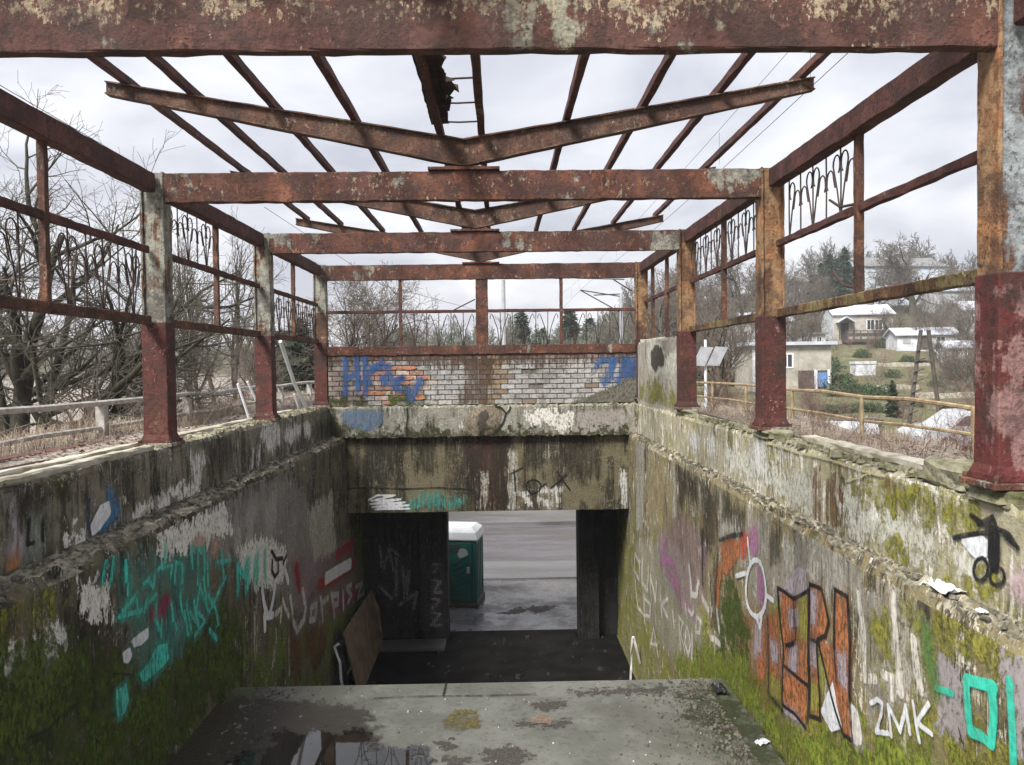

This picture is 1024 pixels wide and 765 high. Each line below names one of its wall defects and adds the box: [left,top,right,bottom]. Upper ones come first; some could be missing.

water stain [365,412,443,486]
water stain [461,407,604,511]
water stain [635,441,645,534]
water stain [687,430,716,459]
water stain [671,464,847,609]
corrosion [812,465,846,532]
water stain [58,590,120,710]
water stain [889,589,922,704]